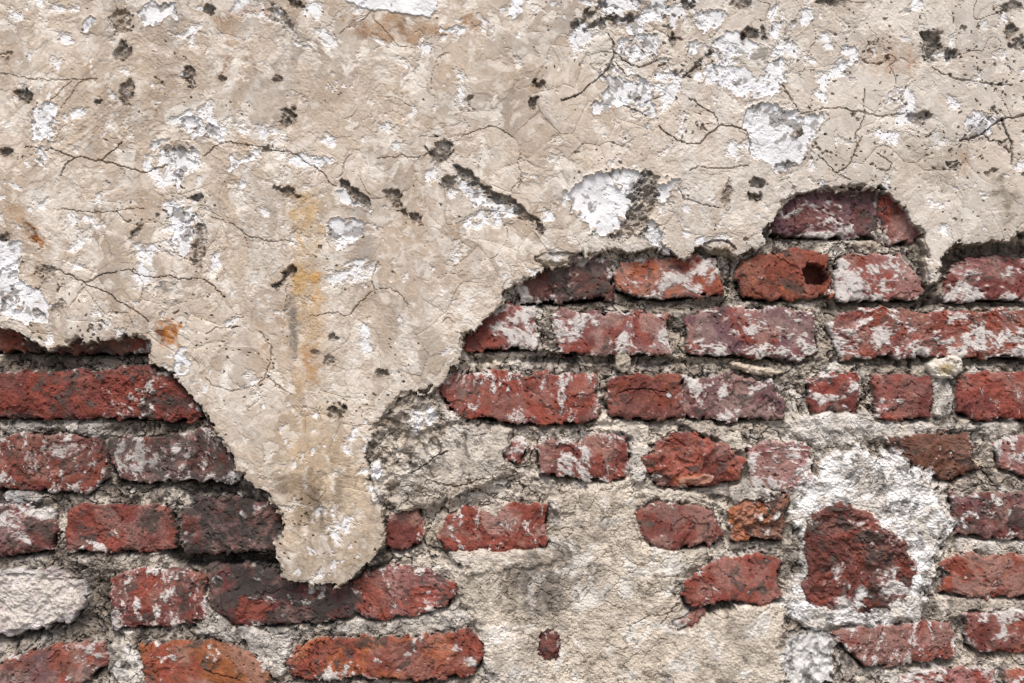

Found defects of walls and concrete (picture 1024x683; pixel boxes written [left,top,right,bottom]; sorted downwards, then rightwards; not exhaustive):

crack [561,39,658,101]
peeling [151,116,220,273]
spalling [425,138,546,236]
crack [623,96,752,170]
peeling [571,0,1024,290]
crack [778,82,905,174]
crack [959,114,1024,165]
crack [51,266,228,323]
spalling [370,168,705,511]
peeling [0,232,385,590]
spalling [808,511,911,607]
water stain [777,441,961,683]